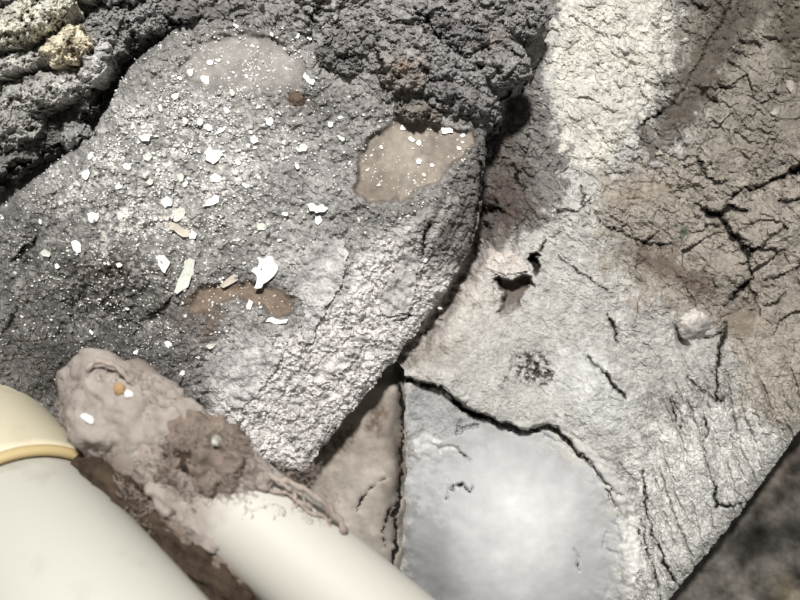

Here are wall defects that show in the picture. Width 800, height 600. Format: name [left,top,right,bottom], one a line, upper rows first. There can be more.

crack [642,0,733,126]
spalling [354,115,476,203]
crack [556,187,671,246]
peeling [188,239,348,348]
peeling [479,248,541,307]
crack [670,155,800,442]
crack [588,357,626,399]
crack [357,378,619,565]
crack [638,471,678,598]
crack [713,482,743,508]